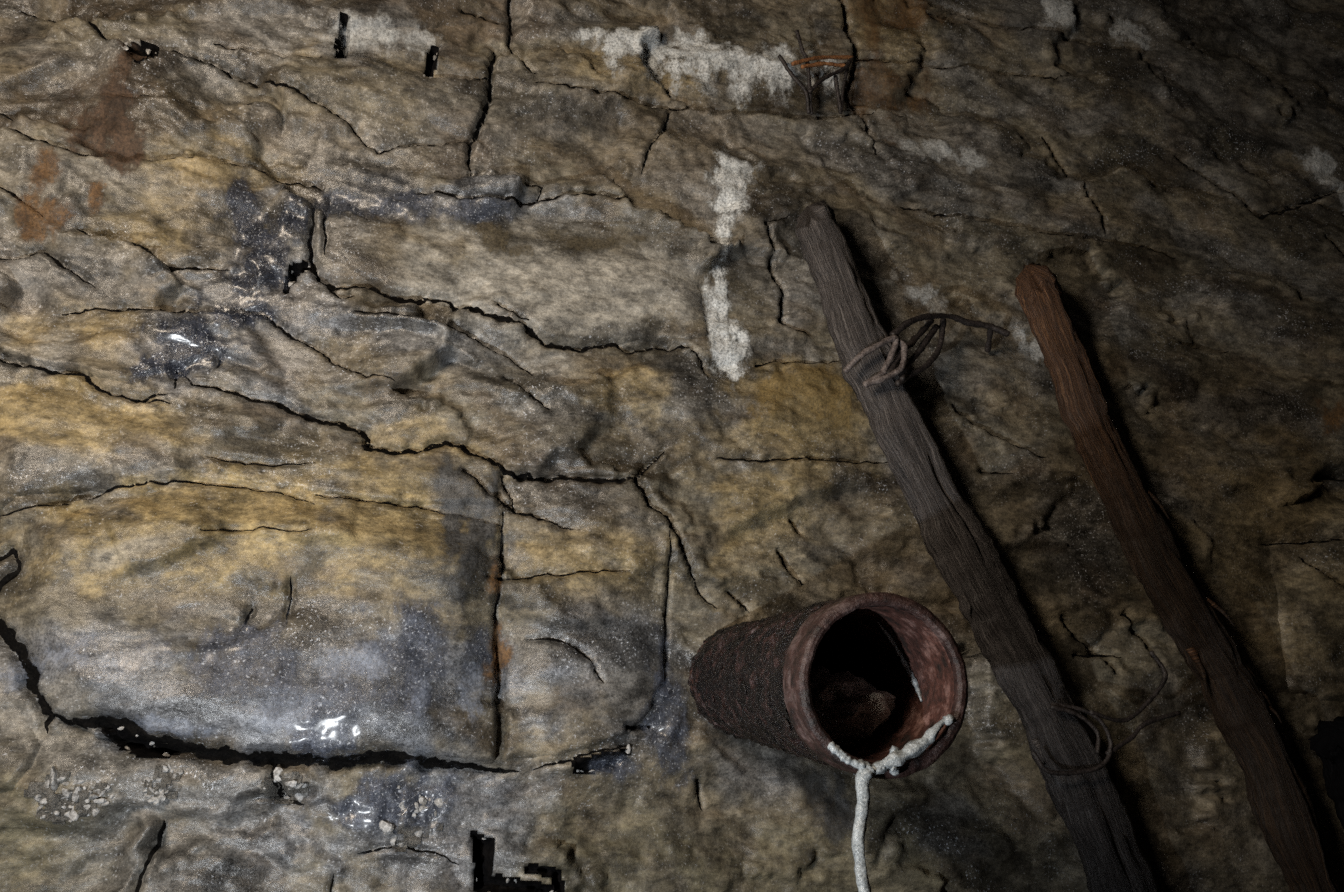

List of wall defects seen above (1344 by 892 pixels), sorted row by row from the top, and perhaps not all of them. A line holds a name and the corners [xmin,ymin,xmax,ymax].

crack [21,0,685,207]
damp [576,26,811,99]
damp [811,59,837,90]
crack [0,252,210,316]
crack [132,242,229,272]
crack [225,163,709,412]
damp [702,150,762,381]
crack [717,456,887,464]
crack [0,355,748,683]
crack [0,548,652,805]
crack [135,820,166,892]
crack [330,845,459,892]